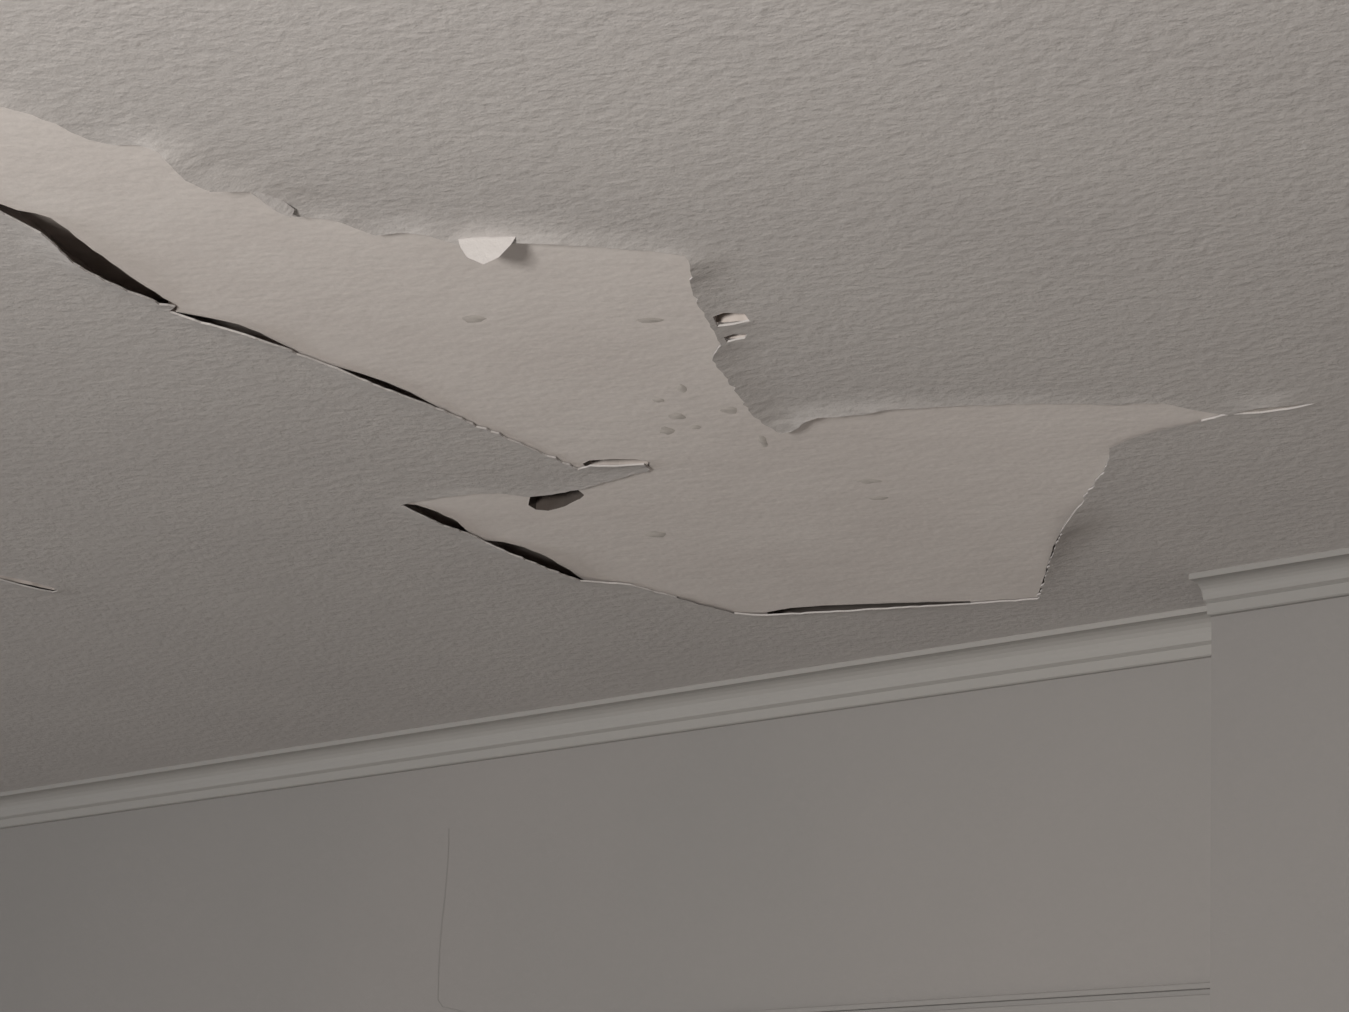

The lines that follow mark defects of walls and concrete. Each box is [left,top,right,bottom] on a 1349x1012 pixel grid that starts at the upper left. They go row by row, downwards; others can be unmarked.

crack [0,571,87,596]
peeling [0,84,1341,619]